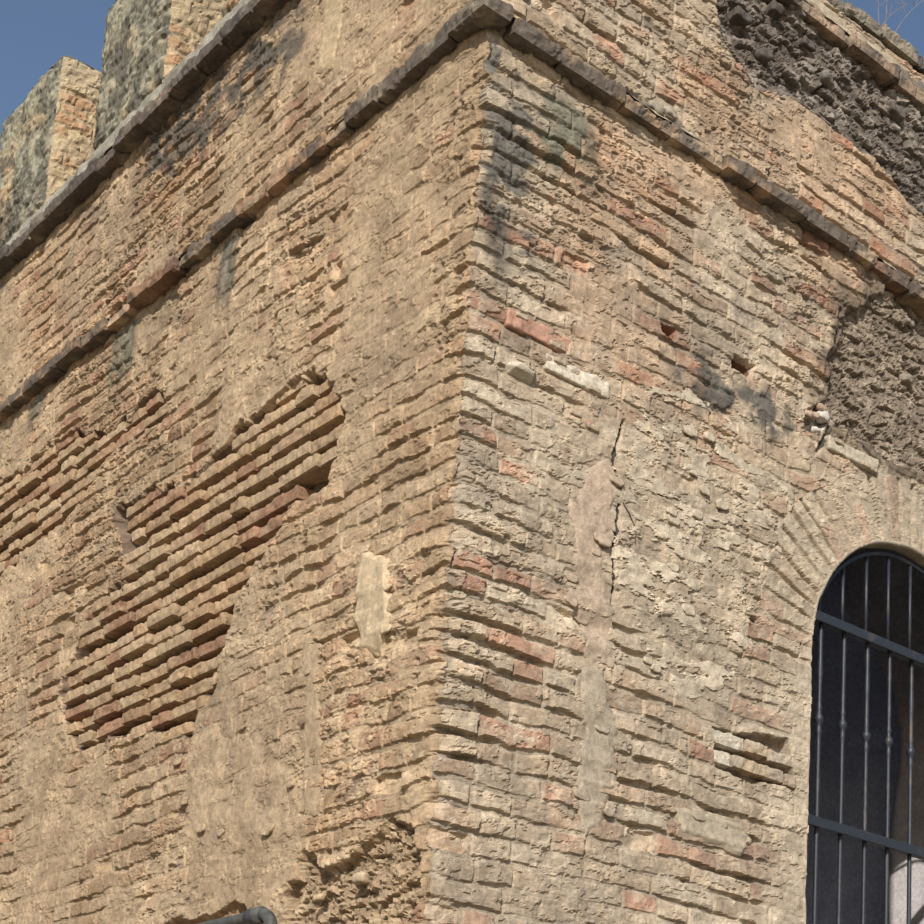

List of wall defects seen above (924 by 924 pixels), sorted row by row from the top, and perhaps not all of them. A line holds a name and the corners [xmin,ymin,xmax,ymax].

spalling [715,0,924,216]
spalling [803,279,924,479]
spalling [0,391,170,577]
spalling [56,376,346,755]
crack [610,422,636,600]
spalling [282,820,423,924]